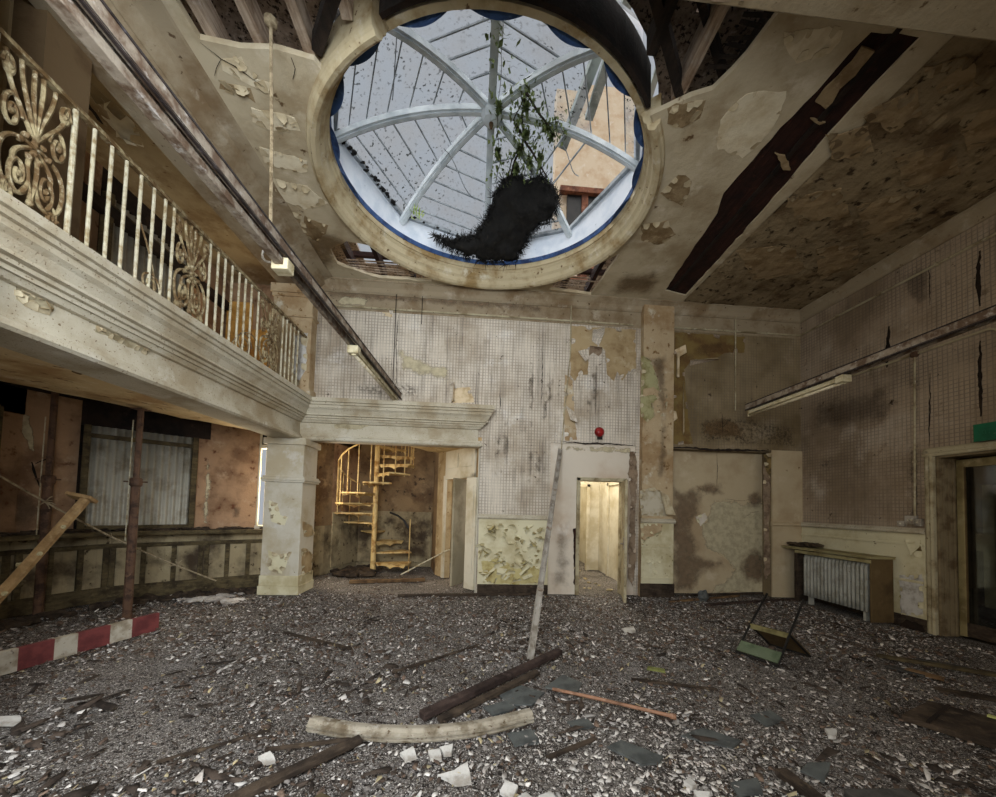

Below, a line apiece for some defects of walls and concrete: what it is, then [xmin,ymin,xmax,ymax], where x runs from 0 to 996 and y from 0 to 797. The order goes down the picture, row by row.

peeling [667,99,706,128]
peeling [716,90,786,158]
peeling [661,175,692,206]
peeling [640,220,676,245]
flaking render [640,356,676,422]
peeling [475,524,545,585]
water stain [673,485,718,589]
water stain [744,552,762,581]